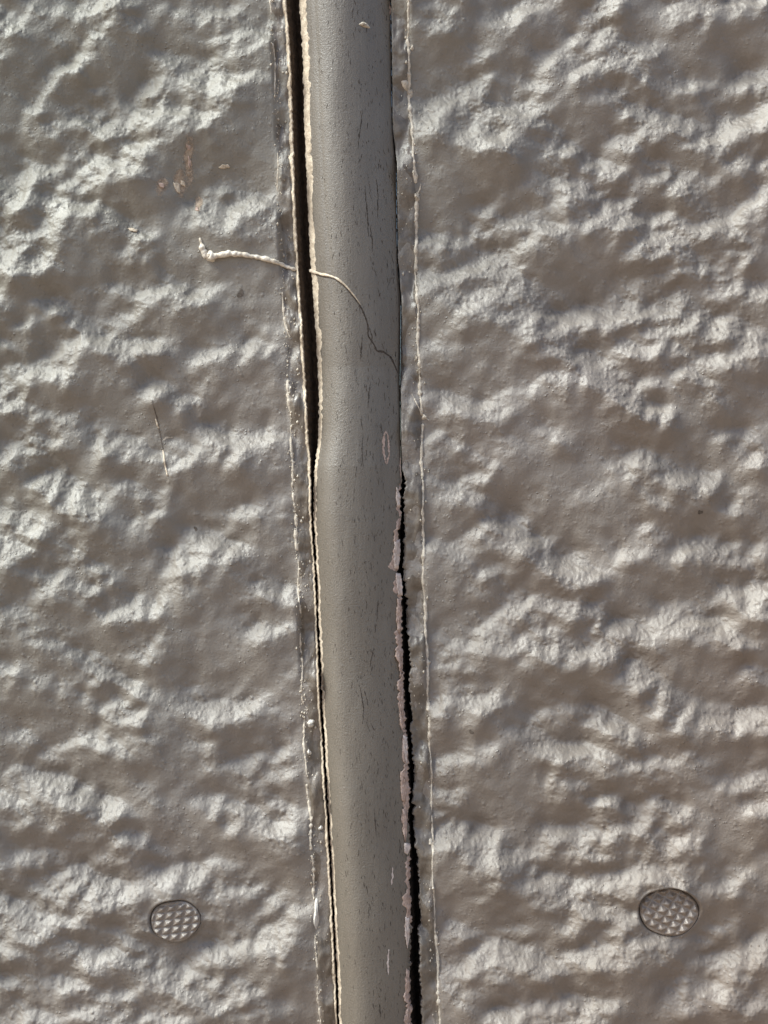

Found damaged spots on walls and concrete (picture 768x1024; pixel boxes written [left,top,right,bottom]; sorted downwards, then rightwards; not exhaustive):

crack [286,0,422,1024]
peeling [382,431,413,1024]